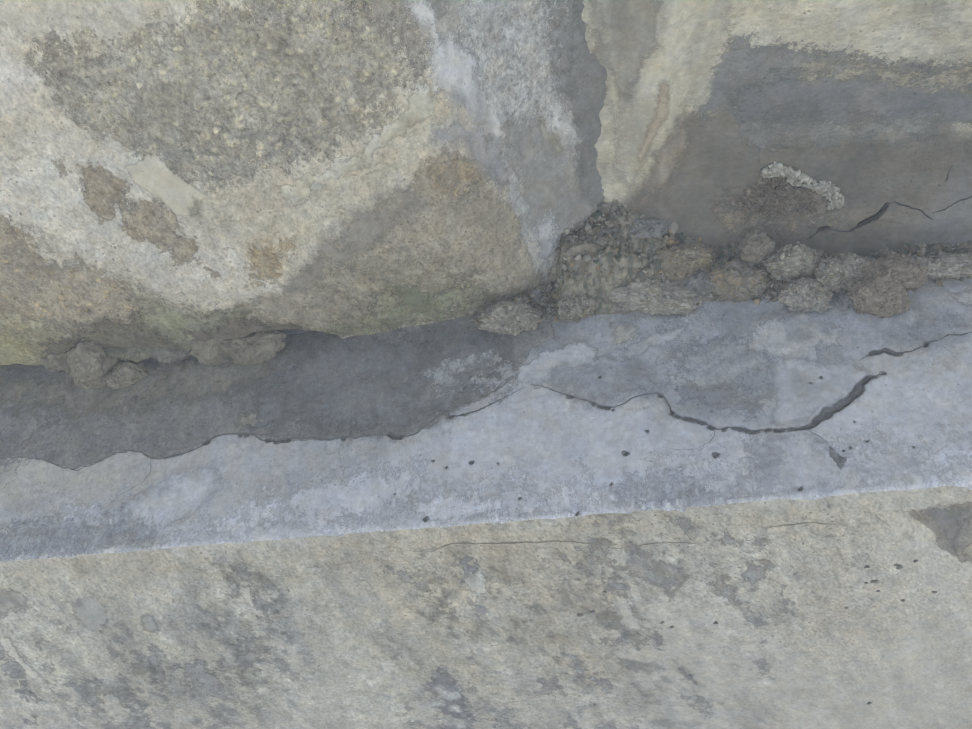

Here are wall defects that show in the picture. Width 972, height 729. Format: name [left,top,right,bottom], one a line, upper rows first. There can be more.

peeling [0,198,742,478]
crack [0,332,972,493]
damp [38,0,972,360]
spalling [748,265,789,305]
crack [806,165,972,240]
spalling [861,240,972,260]